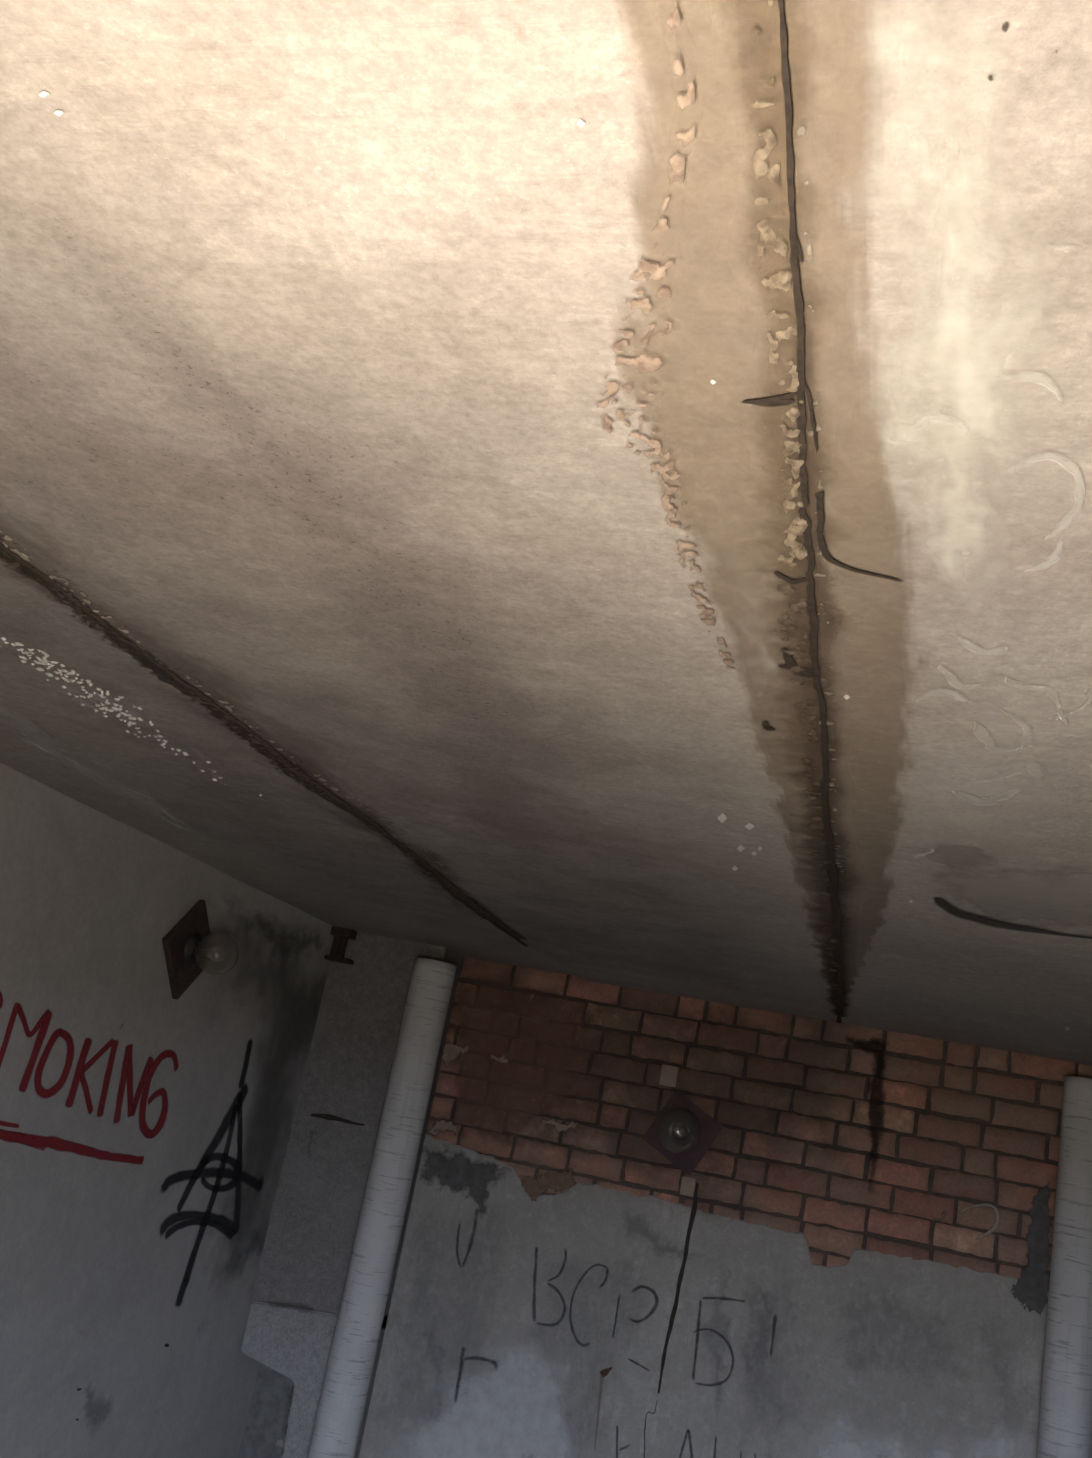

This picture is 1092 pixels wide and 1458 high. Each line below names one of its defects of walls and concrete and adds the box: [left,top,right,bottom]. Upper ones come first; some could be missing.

crack [0,525,529,947]
leakage [632,0,904,1016]
crack [742,0,902,1023]
leakage [906,231,1032,578]